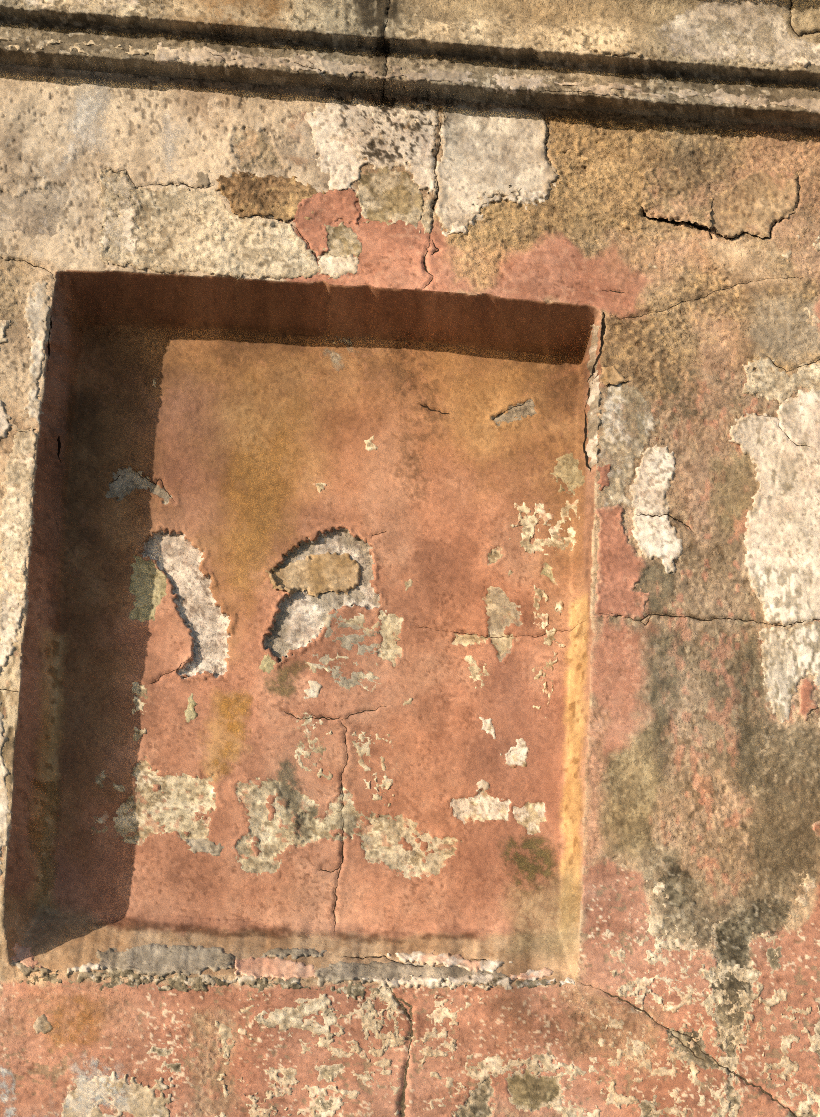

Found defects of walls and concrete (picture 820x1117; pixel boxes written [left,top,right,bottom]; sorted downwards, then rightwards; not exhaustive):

damp [347,0,397,60]
peeling [0,36,820,280]
crack [640,176,801,239]
peeling [0,280,51,676]
peeling [728,357,820,729]
flaking render [91,527,462,880]
damp [649,631,681,774]
crack [285,706,385,926]
damp [658,857,696,907]
damp [717,893,790,957]
crack [344,955,434,1117]
crack [577,981,797,1117]